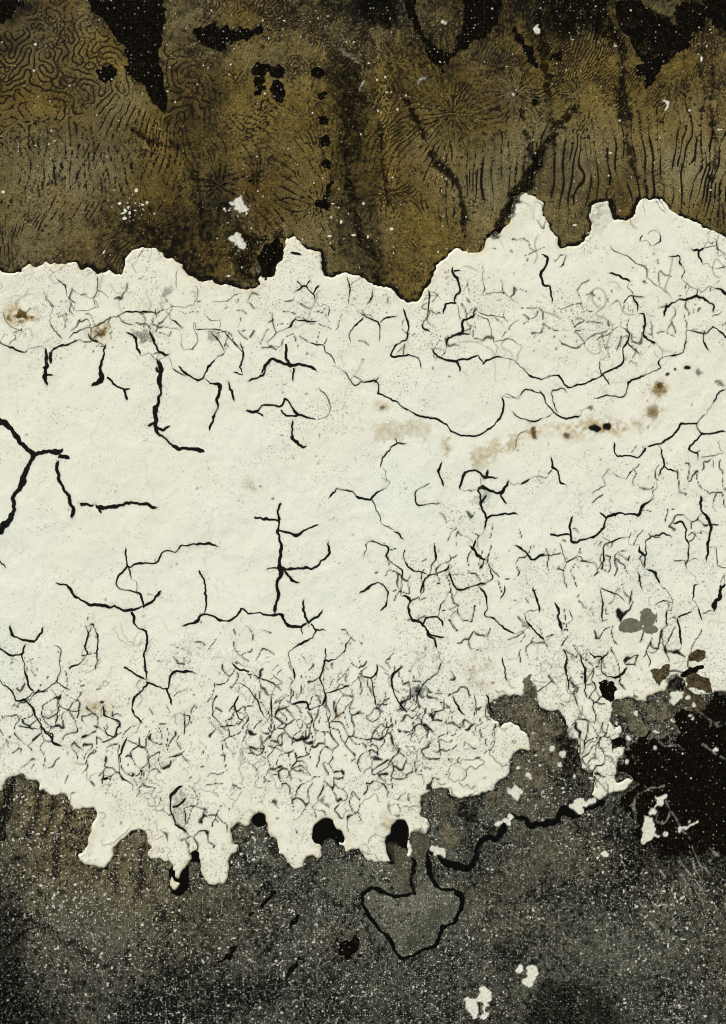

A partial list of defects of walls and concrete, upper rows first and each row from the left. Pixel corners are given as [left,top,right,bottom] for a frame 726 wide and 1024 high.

damp [86,0,178,148]
damp [193,22,264,51]
damp [230,222,283,280]
damp [251,62,286,103]
damp [311,44,376,278]
peeling [0,0,726,303]
crack [0,149,726,453]
damp [359,0,502,73]
damp [488,0,726,239]
crack [0,389,726,888]
peeling [0,649,726,1024]
damp [612,692,726,862]